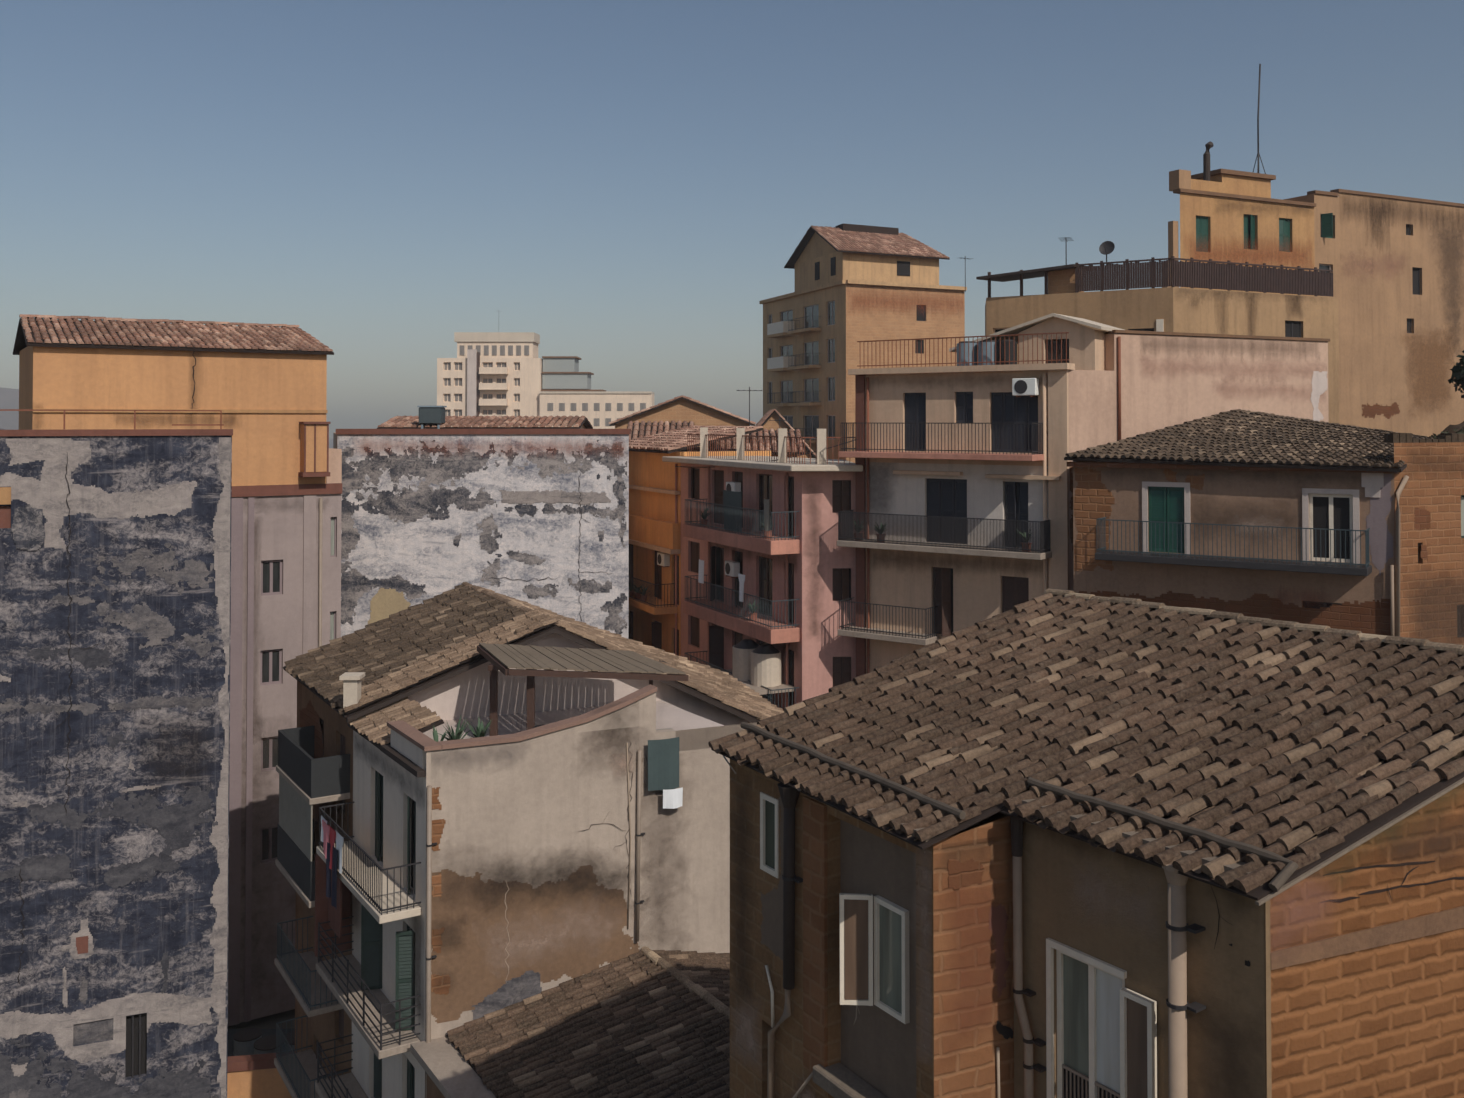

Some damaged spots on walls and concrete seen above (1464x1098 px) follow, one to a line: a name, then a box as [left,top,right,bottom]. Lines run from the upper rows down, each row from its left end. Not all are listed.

crack [190,353,198,407]
peeling [483,440,627,480]
peeling [496,504,538,517]
peeling [481,554,502,587]
flaking render [368,588,411,624]
peeling [0,437,231,1098]
crack [1319,861,1464,903]